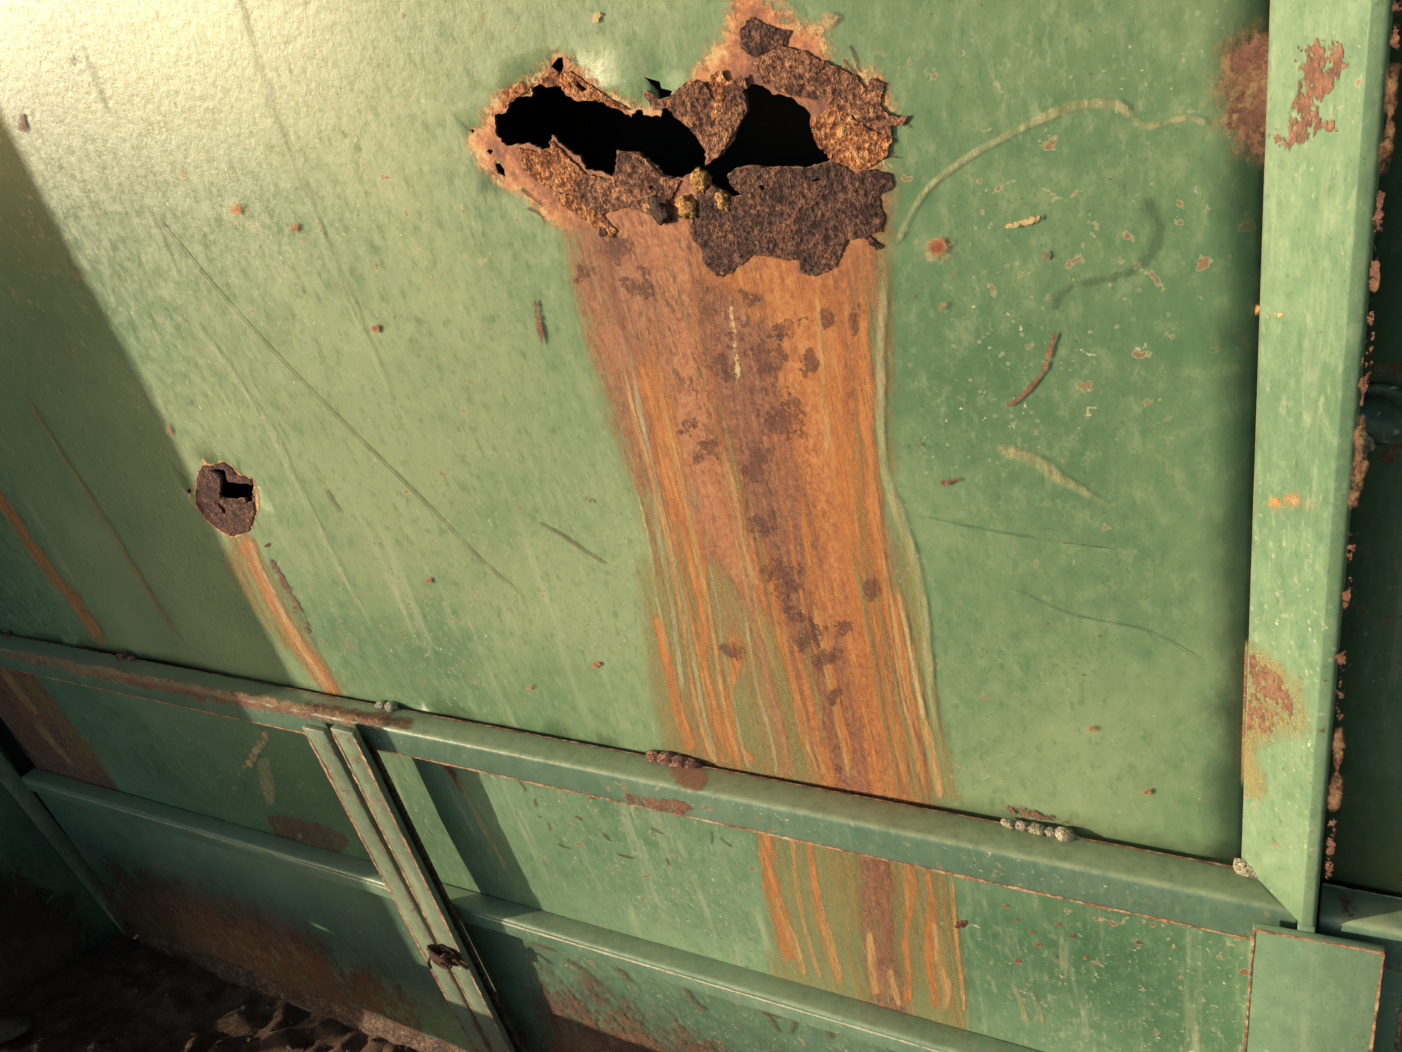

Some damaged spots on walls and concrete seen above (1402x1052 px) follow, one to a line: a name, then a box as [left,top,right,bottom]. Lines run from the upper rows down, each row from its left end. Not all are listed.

rust [466,0,954,815]
rust [0,459,412,730]
rust [759,834,967,1030]